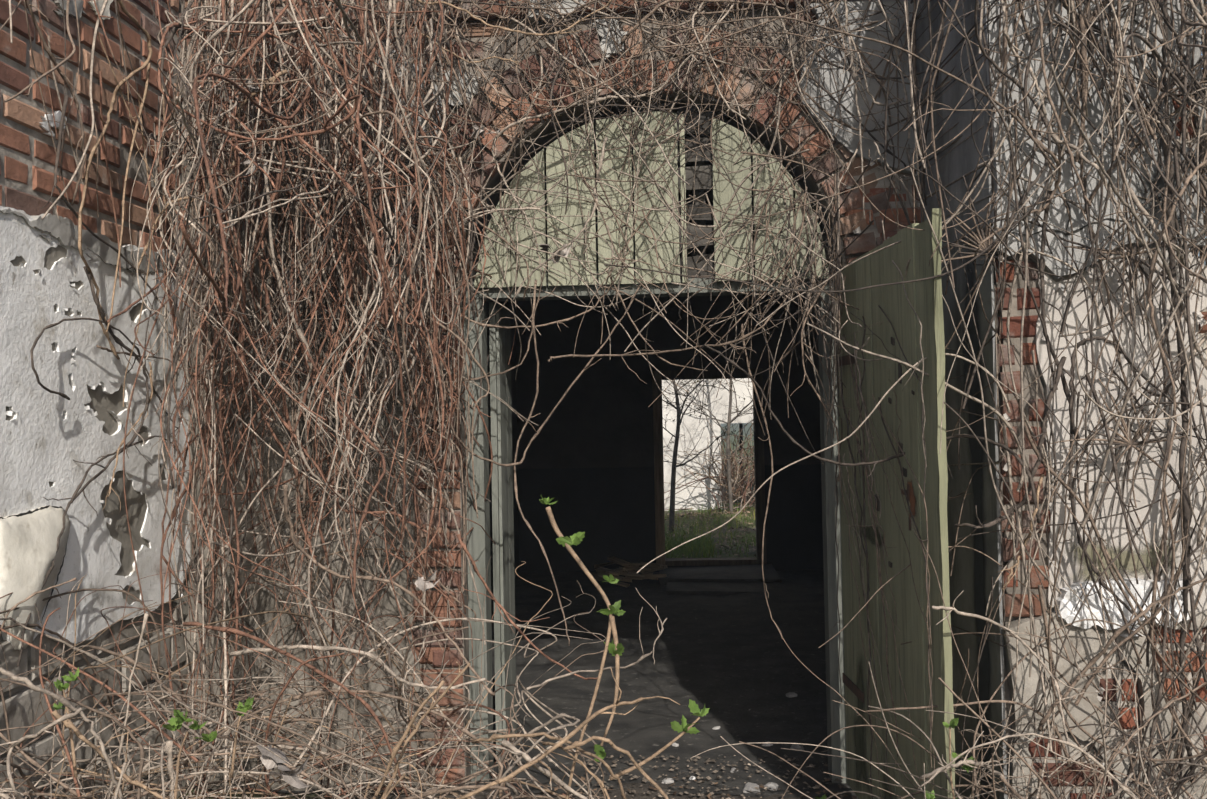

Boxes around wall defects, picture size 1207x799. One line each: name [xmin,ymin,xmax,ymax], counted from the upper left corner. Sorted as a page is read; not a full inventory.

spalling [1196,307,1207,356]
peeling [84,383,127,435]
peeling [99,470,150,605]
spalling [1096,661,1139,751]
spalling [1120,625,1207,778]